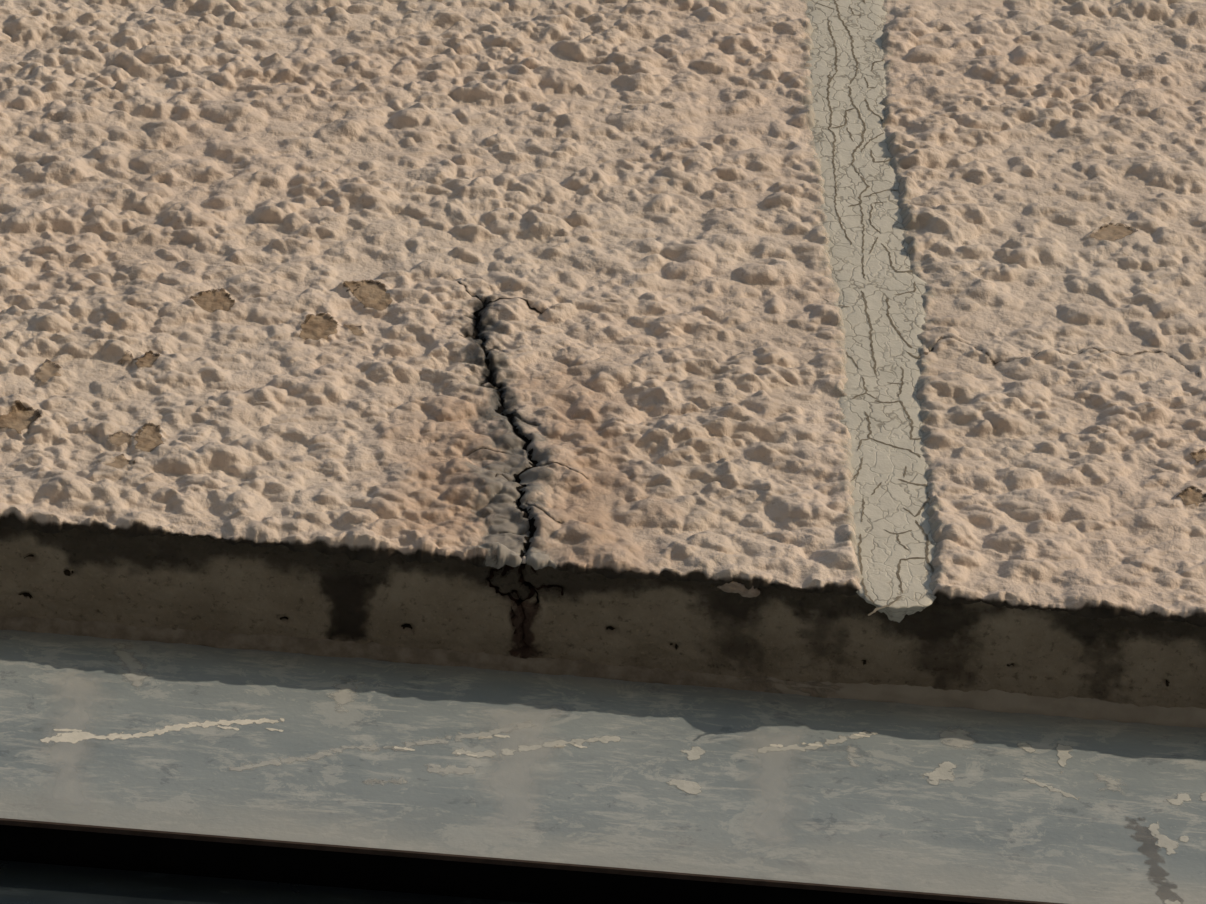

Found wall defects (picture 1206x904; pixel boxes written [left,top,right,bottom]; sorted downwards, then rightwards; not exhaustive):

peeling [1090,223,1138,241]
peeling [189,288,235,312]
peeling [343,280,392,311]
crack [816,0,1199,616]
peeling [299,312,364,340]
peeling [119,350,160,368]
peeling [0,400,42,434]
peeling [106,422,164,468]
crack [457,281,587,645]
water stain [0,297,1206,644]
peeling [1176,486,1206,506]
peeling [924,761,956,785]